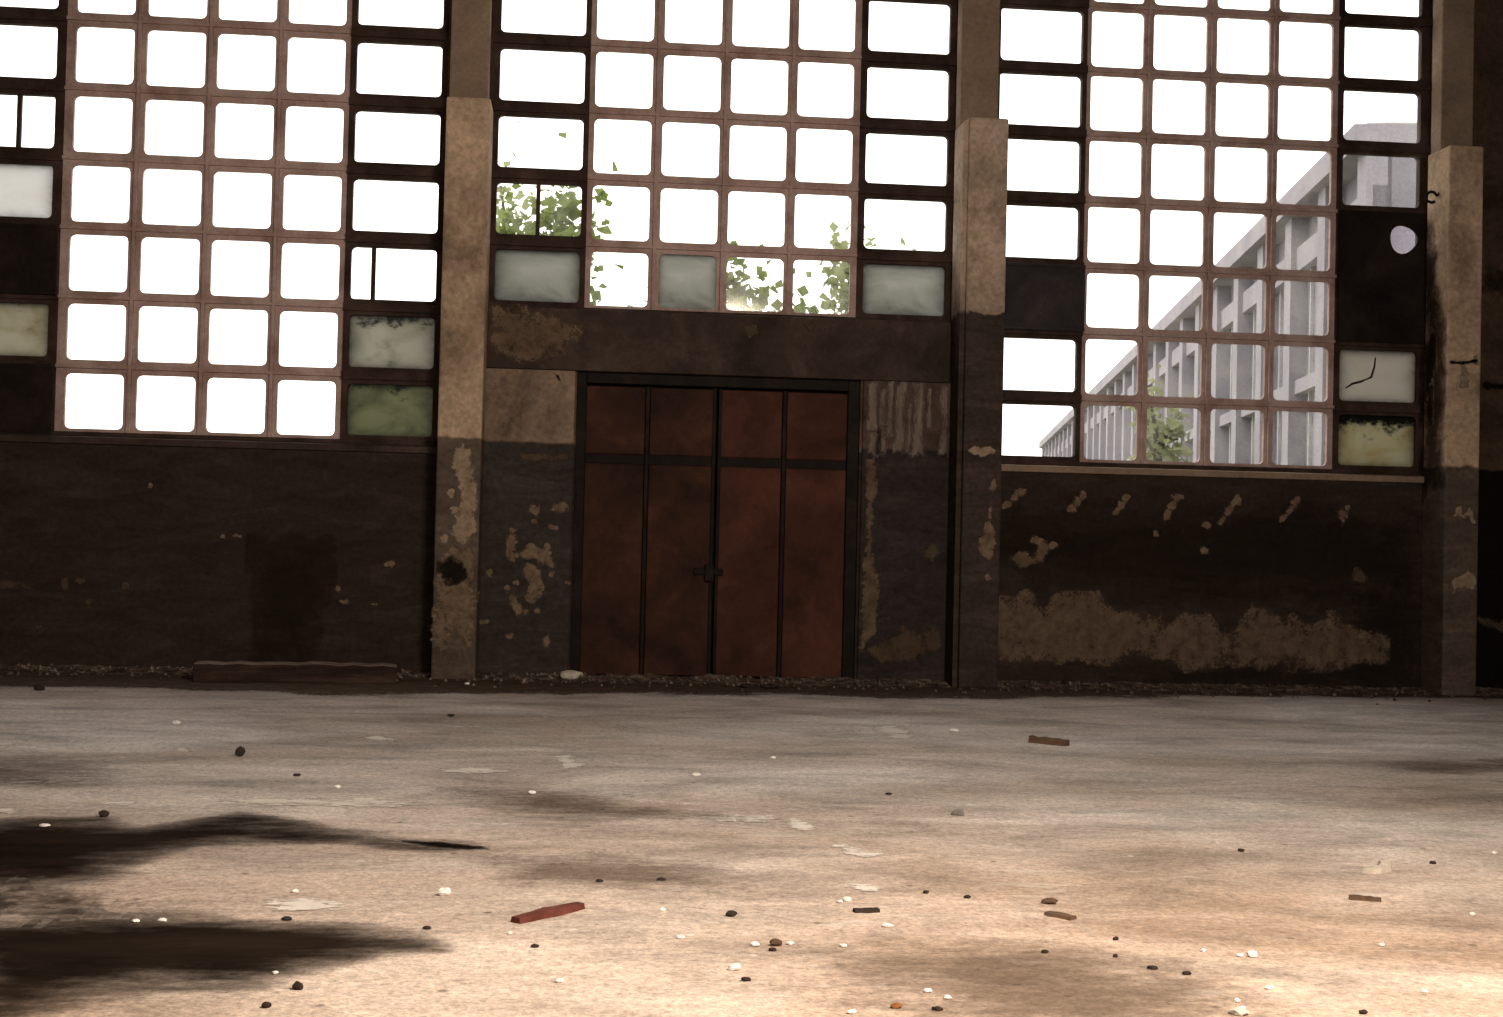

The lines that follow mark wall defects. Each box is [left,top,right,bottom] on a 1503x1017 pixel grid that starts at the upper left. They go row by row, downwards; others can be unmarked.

leakage [866,381,950,457]
peeling [430,444,571,651]
peeling [858,459,942,663]
peeling [978,479,1391,674]